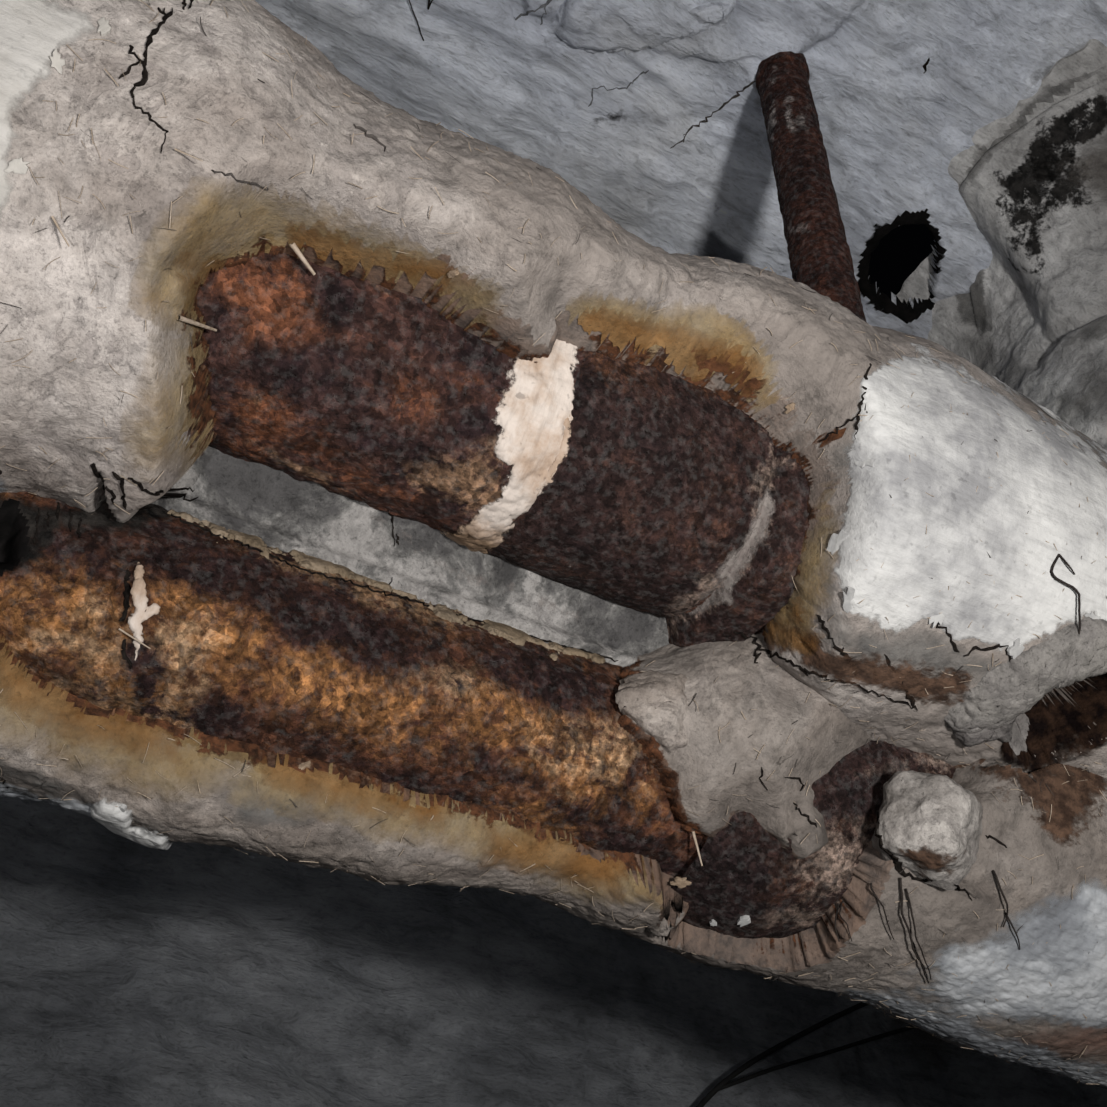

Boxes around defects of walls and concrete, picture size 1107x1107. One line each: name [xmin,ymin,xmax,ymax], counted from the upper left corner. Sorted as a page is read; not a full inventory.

peeling [0,0,111,213]
crack [119,0,194,153]
water stain [968,81,1107,284]
spalling [181,236,309,455]
corrosion [151,199,482,322]
spalling [408,268,549,363]
spalling [577,334,818,577]
crack [90,463,430,607]
corrosion [0,634,222,778]
crack [734,614,918,711]
corrosion [763,534,972,705]
corrosion [249,757,646,894]